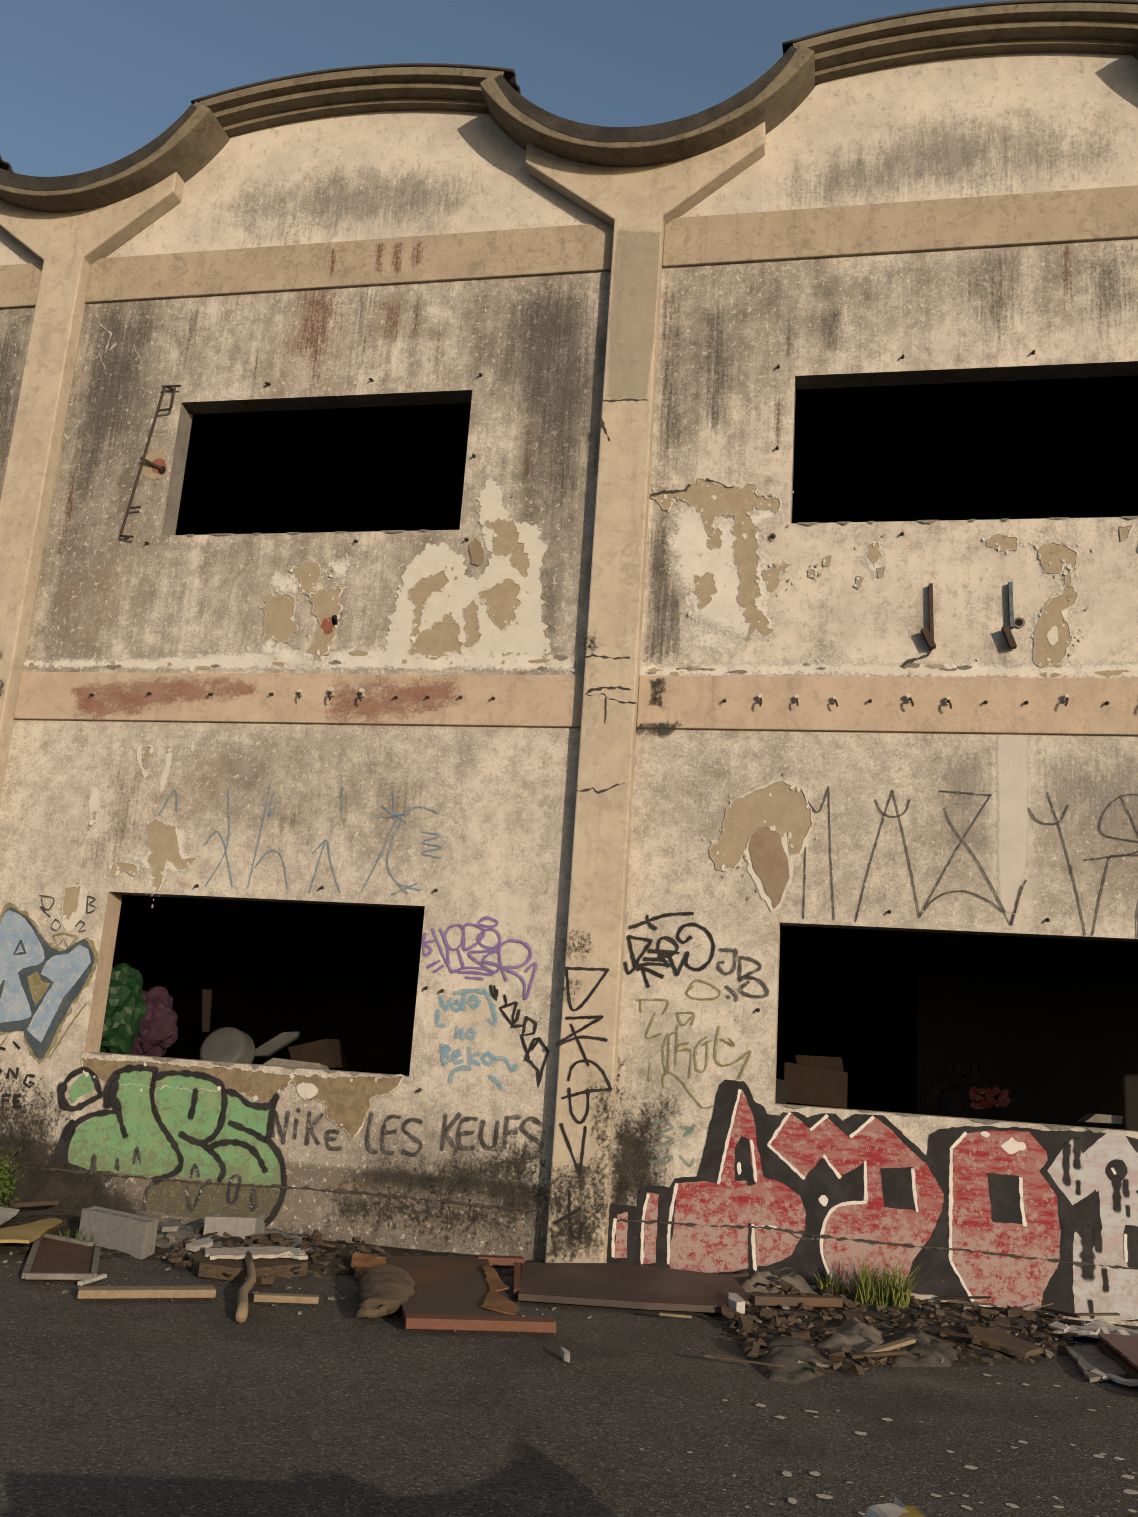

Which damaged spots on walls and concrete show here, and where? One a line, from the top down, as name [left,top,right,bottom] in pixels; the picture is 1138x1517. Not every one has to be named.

spalling [142,448,168,479]
peeling [24,477,576,674]
peeling [639,478,1138,678]
corrosion [73,678,255,718]
corrosion [329,680,455,718]
peeling [703,772,817,911]
water stain [0,1060,133,1214]
water stain [325,1059,679,1263]